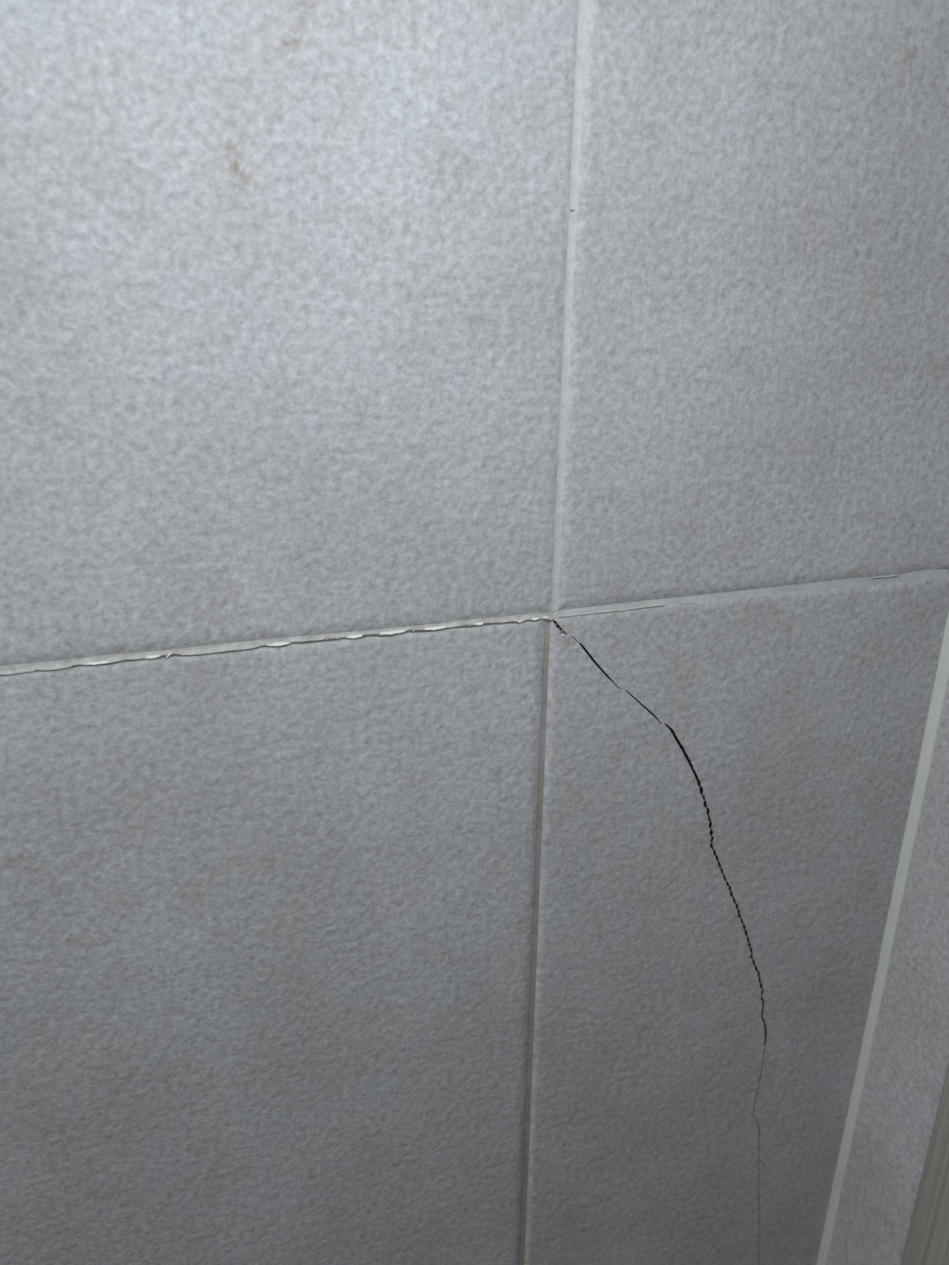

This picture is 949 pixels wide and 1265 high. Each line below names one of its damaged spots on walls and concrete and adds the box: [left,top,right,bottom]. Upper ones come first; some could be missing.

crack [553,620,767,1183]